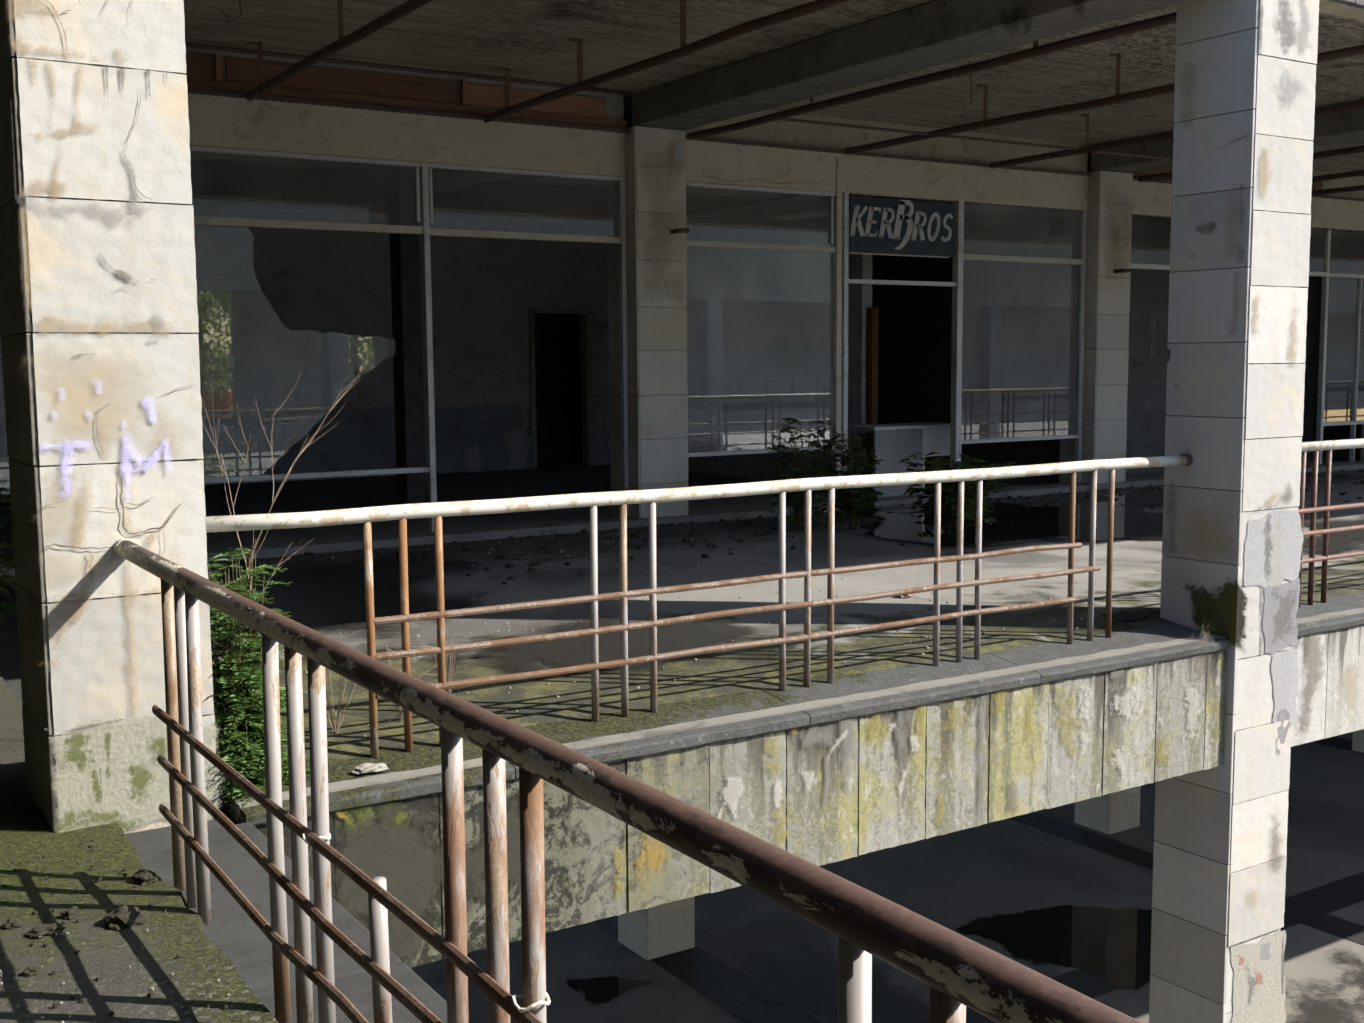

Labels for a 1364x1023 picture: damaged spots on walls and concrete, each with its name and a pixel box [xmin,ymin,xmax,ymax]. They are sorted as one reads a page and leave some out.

crack [46,0,133,51]
crack [124,99,150,201]
crack [40,403,183,578]
peeling [1244,509,1304,754]
peeling [45,714,170,833]
peeling [203,723,223,821]
spalling [350,763,389,774]
water stain [802,704,855,802]
water stain [329,801,444,969]
water stain [465,832,485,912]
water stain [506,800,521,891]
peeling [1230,930,1286,1023]